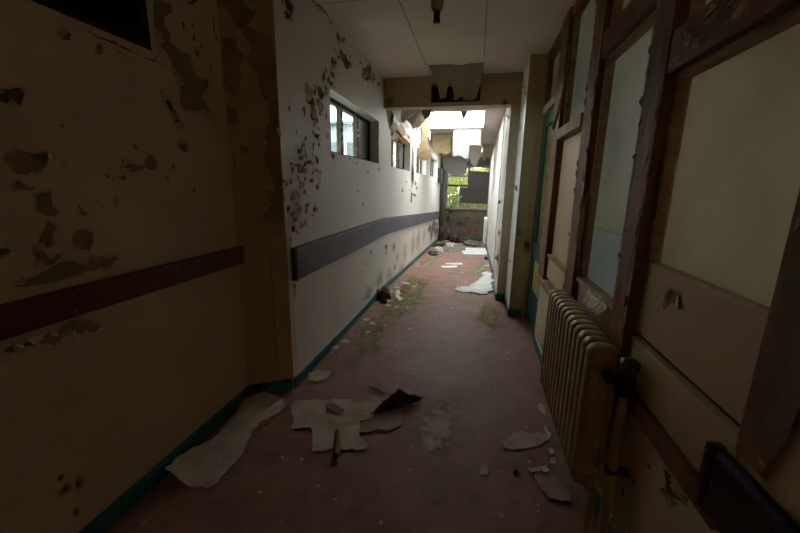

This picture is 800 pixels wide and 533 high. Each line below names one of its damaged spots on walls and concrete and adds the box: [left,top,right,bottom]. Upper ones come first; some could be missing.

peeling [0,87,27,106]
peeling [152,0,216,152]
peeling [213,0,380,241]
flaking render [386,110,412,162]
peeling [3,147,119,288]